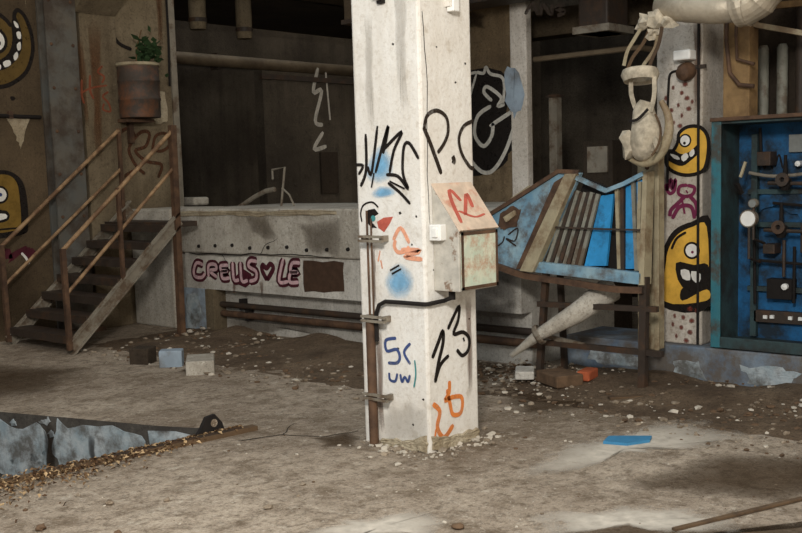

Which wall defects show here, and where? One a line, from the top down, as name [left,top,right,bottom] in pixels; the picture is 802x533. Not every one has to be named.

peeling [673,360,706,380]
peeling [740,365,801,386]
peeling [0,412,258,487]